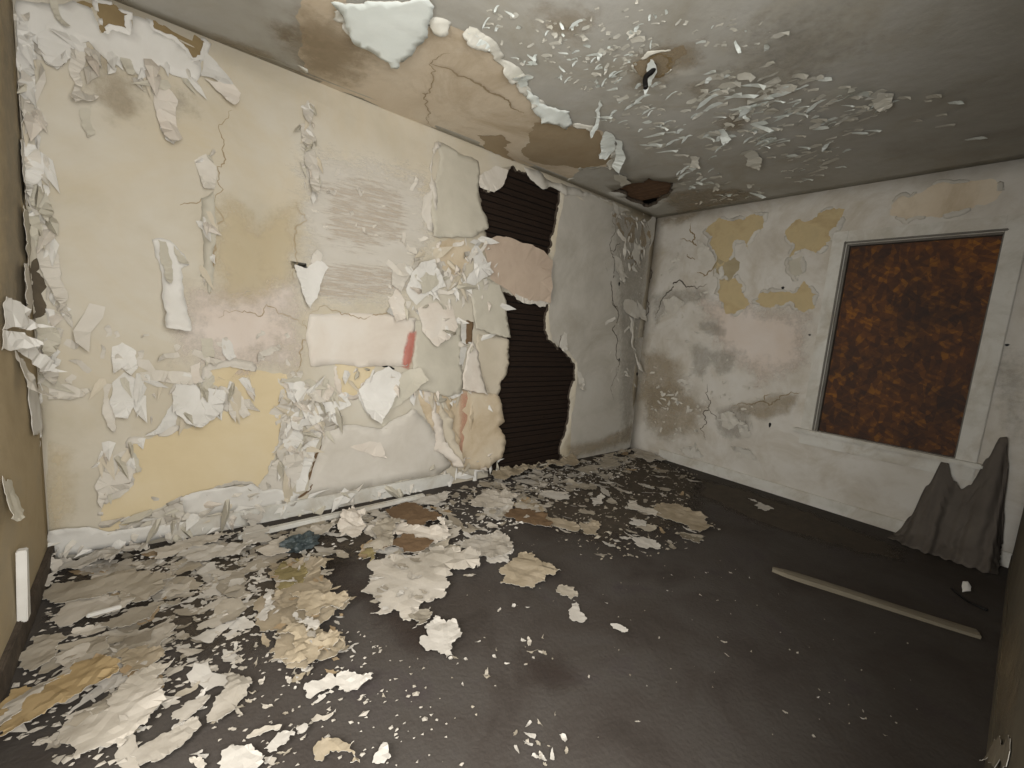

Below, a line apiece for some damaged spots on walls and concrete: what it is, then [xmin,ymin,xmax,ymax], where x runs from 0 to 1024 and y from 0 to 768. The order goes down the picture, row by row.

peeling [77,0,133,35]
peeling [146,18,211,63]
crack [423,53,519,126]
peeling [295,0,911,317]
peeling [890,179,1004,224]
spalling [30,258,47,320]
crack [646,224,718,315]
peeling [64,303,124,384]
peeling [97,333,375,542]
spalling [488,292,575,477]
crack [700,390,799,440]